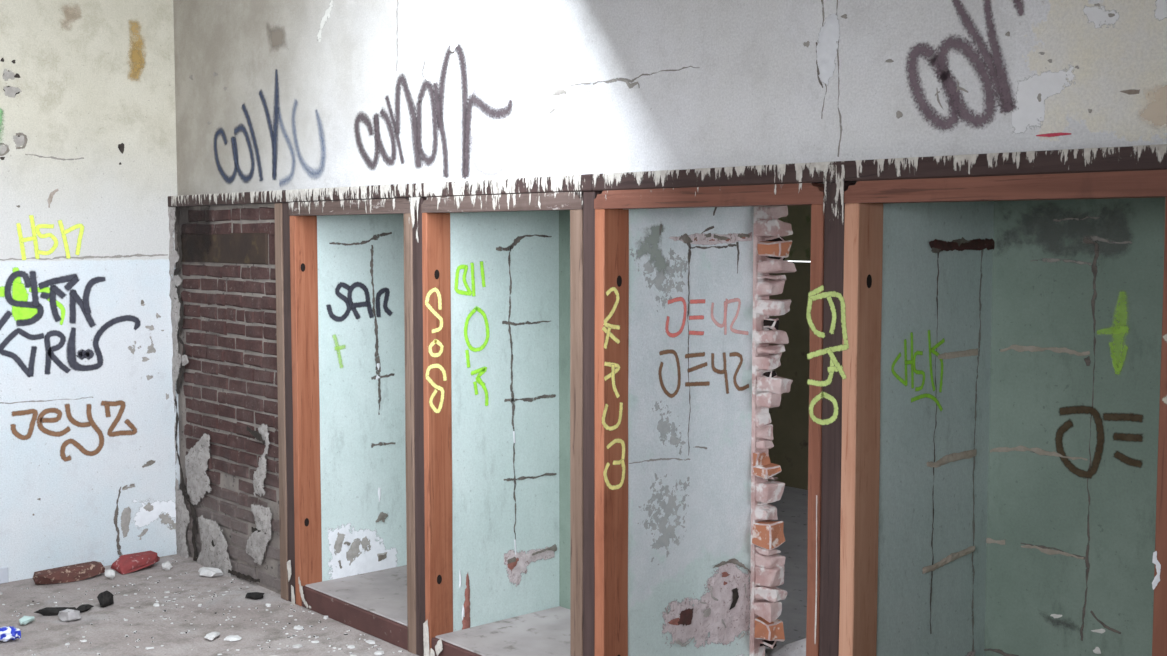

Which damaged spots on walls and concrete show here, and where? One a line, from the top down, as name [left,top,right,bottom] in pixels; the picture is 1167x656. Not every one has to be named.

crack [570,66,699,88]
peeling [121,0,1167,583]
peeling [287,560,311,608]
spalling [459,572,470,629]
peeling [1152,551,1161,590]
peeling [423,619,443,656]